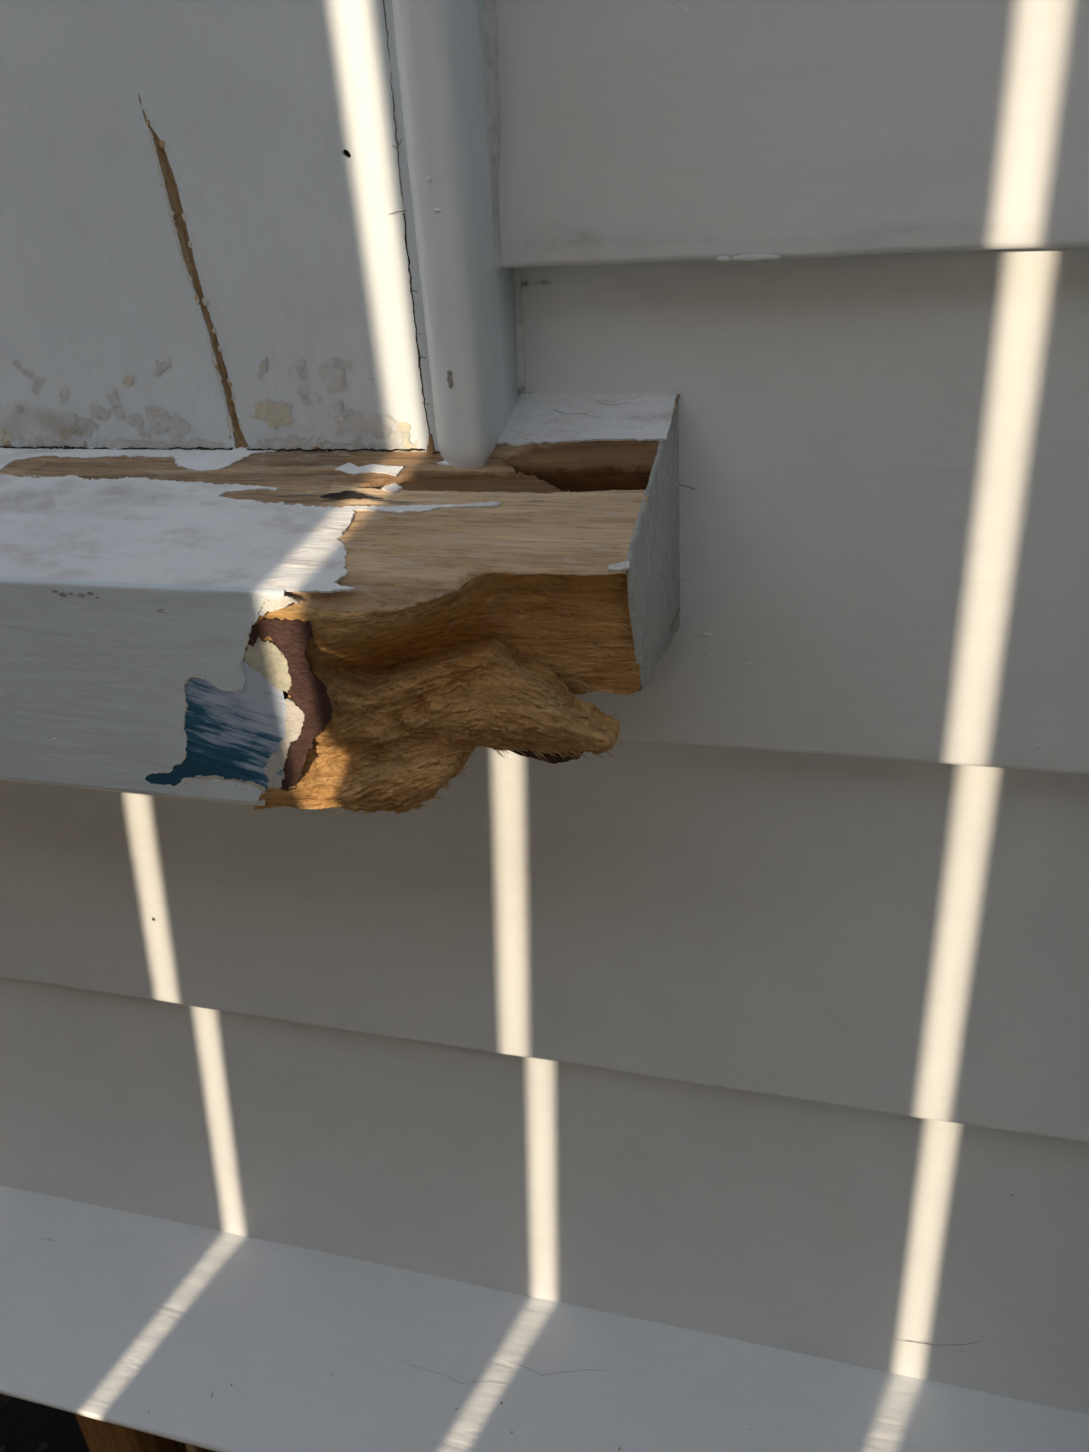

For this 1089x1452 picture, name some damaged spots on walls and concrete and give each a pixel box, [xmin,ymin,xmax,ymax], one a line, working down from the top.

crack [139,96,251,450]
crack [383,0,436,455]
peeling [0,375,224,449]
peeling [246,355,426,452]
peeling [145,596,332,805]